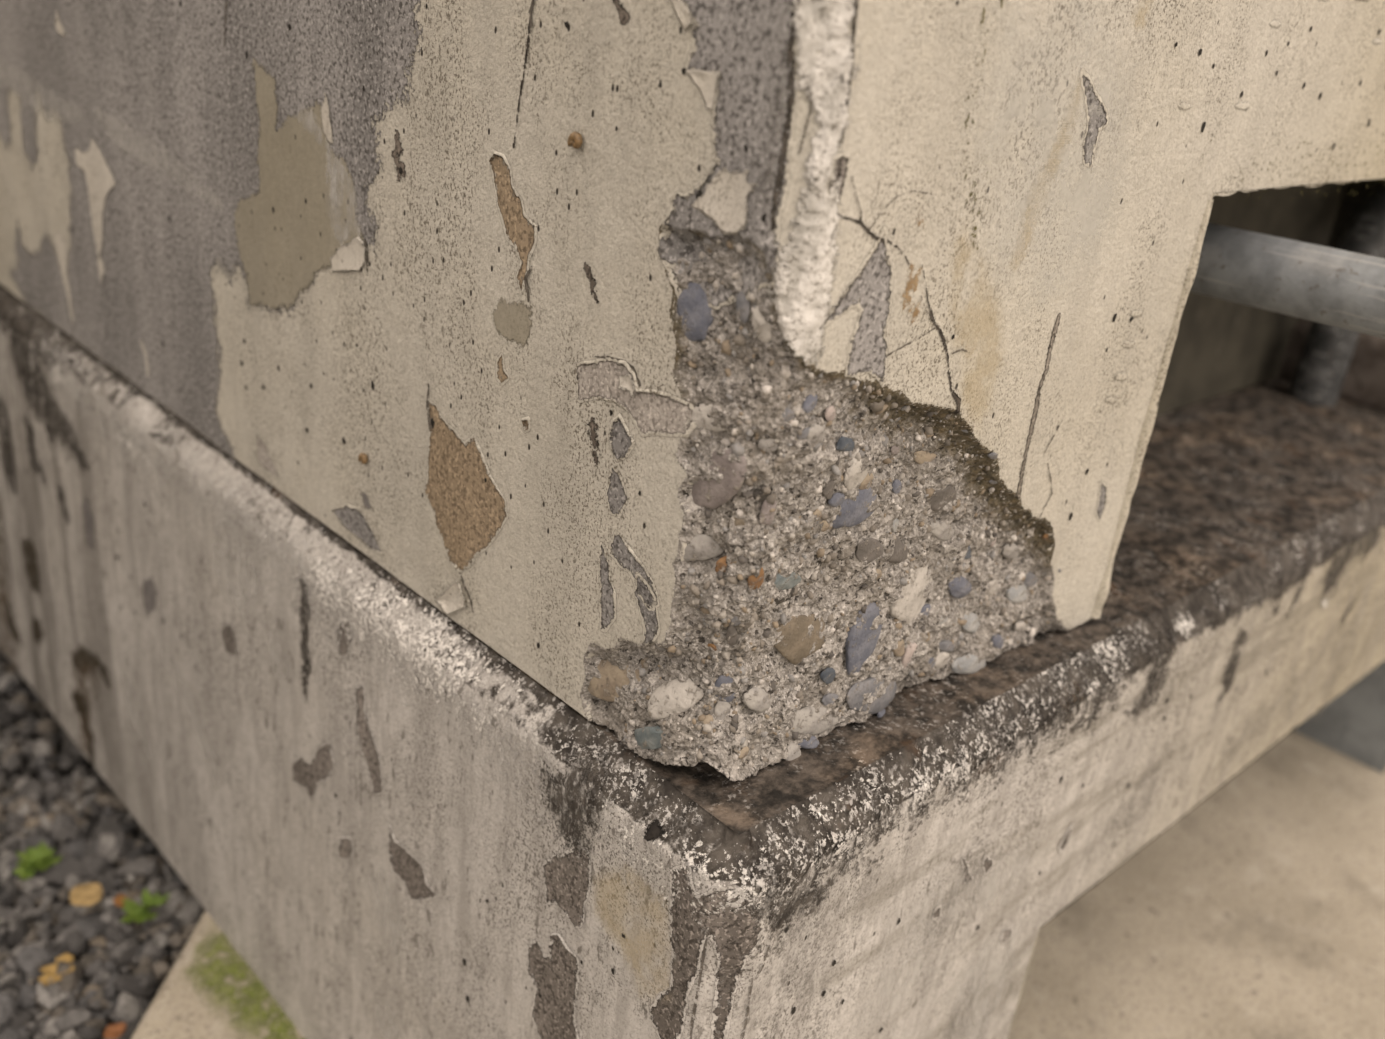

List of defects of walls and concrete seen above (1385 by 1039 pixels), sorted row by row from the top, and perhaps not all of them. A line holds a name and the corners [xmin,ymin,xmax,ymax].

peeling [0,0,423,458]
crack [770,0,967,414]
peeling [1080,68,1109,168]
peeling [424,398,508,615]
spalling [574,0,1069,782]
crack [1014,313,1063,517]
water stain [1031,623,1177,743]
water stain [1216,629,1253,705]
water stain [1270,525,1381,618]